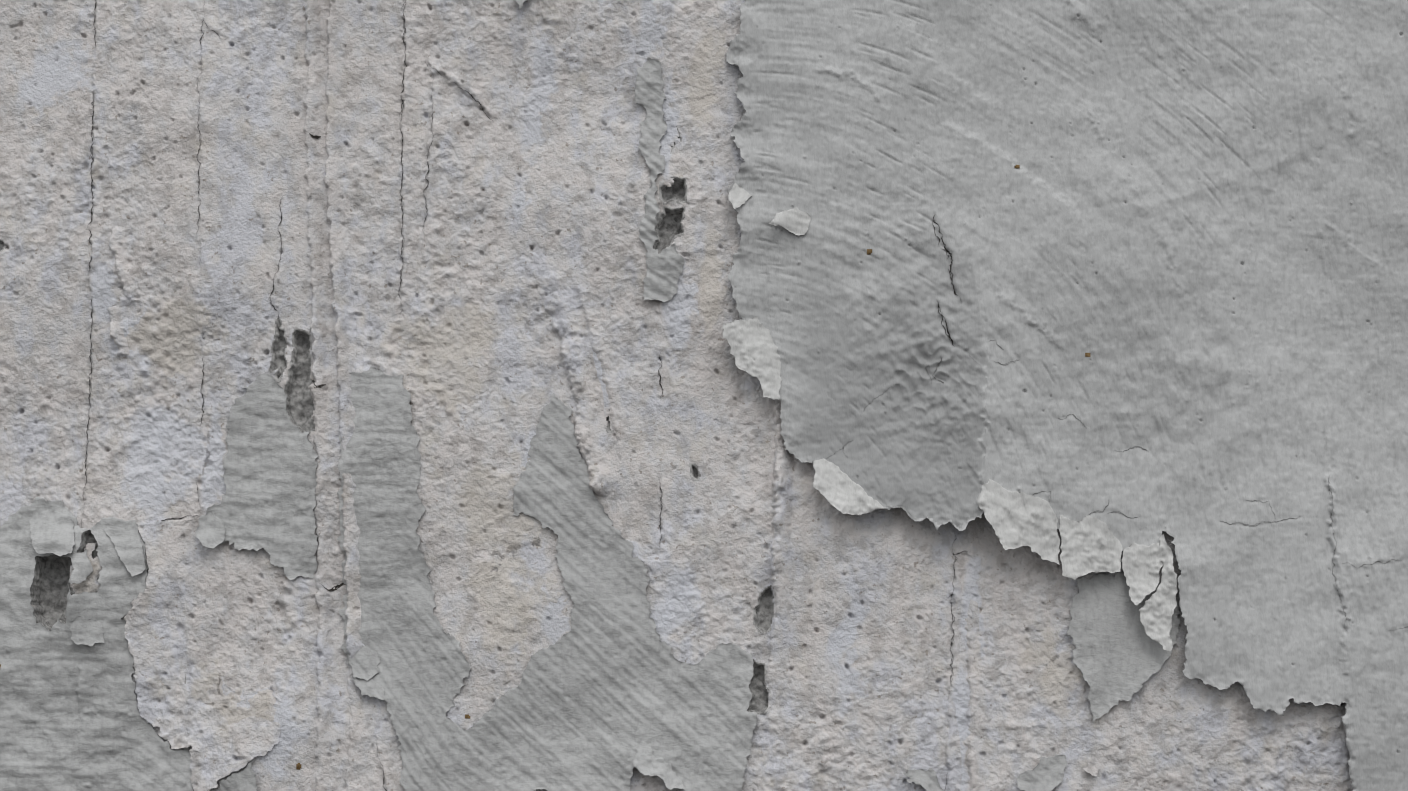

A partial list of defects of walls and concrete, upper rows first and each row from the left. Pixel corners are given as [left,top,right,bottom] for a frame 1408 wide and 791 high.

crack [399,0,493,312]
peeling [635,57,687,302]
peeling [0,496,194,791]
peeling [195,318,319,580]
peeling [337,367,774,791]
peeling [723,0,1408,791]